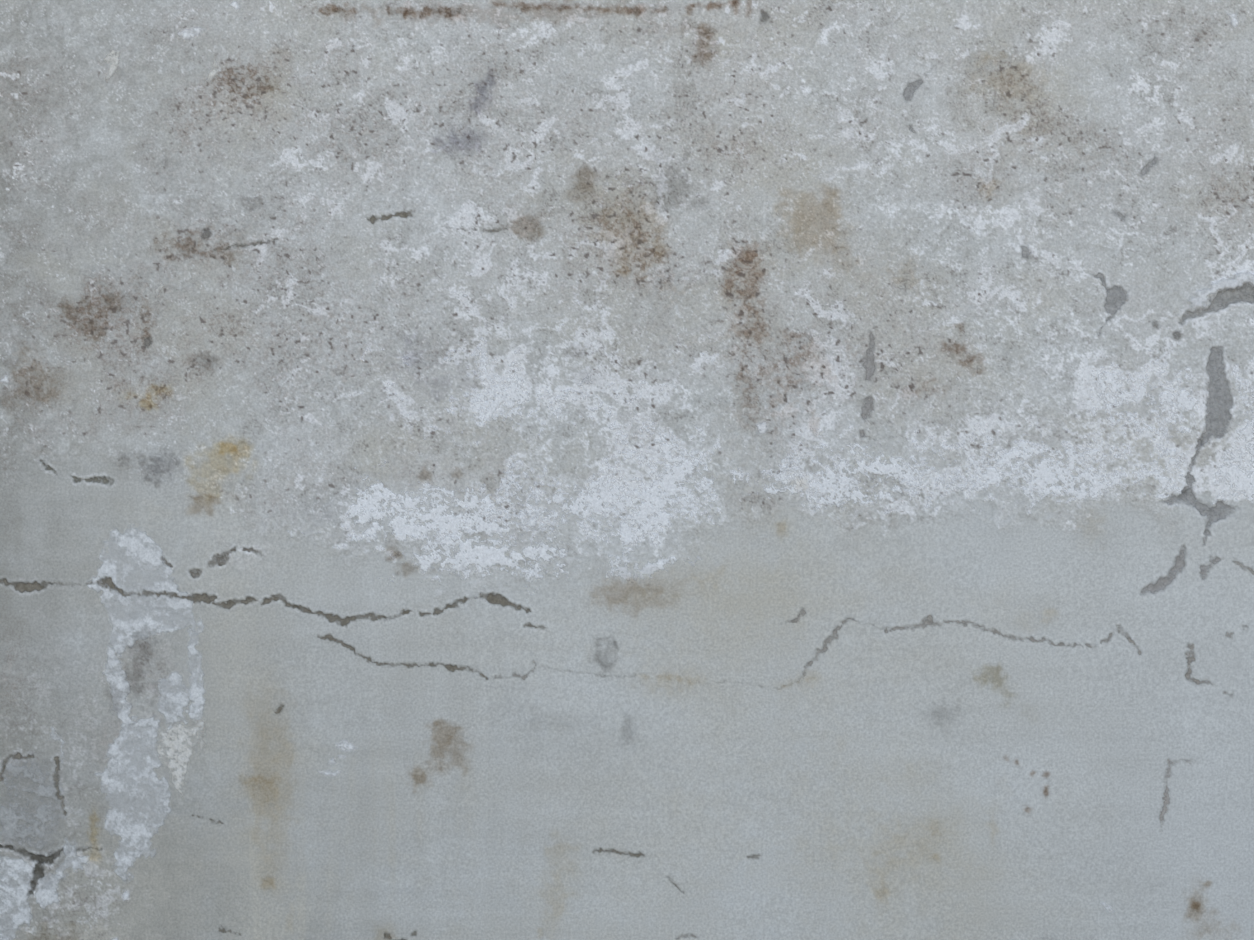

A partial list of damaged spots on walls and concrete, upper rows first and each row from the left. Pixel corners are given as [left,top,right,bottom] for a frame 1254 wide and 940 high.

spalling [1173,284,1254,339]
spalling [863,333,875,380]
peeling [731,347,1254,542]
crack [0,579,50,593]
spalling [190,548,256,578]
spalling [1142,546,1185,593]
crack [98,577,537,680]
crack [803,620,846,676]
crack [885,615,1141,655]
peeling [88,528,205,900]
crack [0,753,66,815]
crack [0,845,62,894]